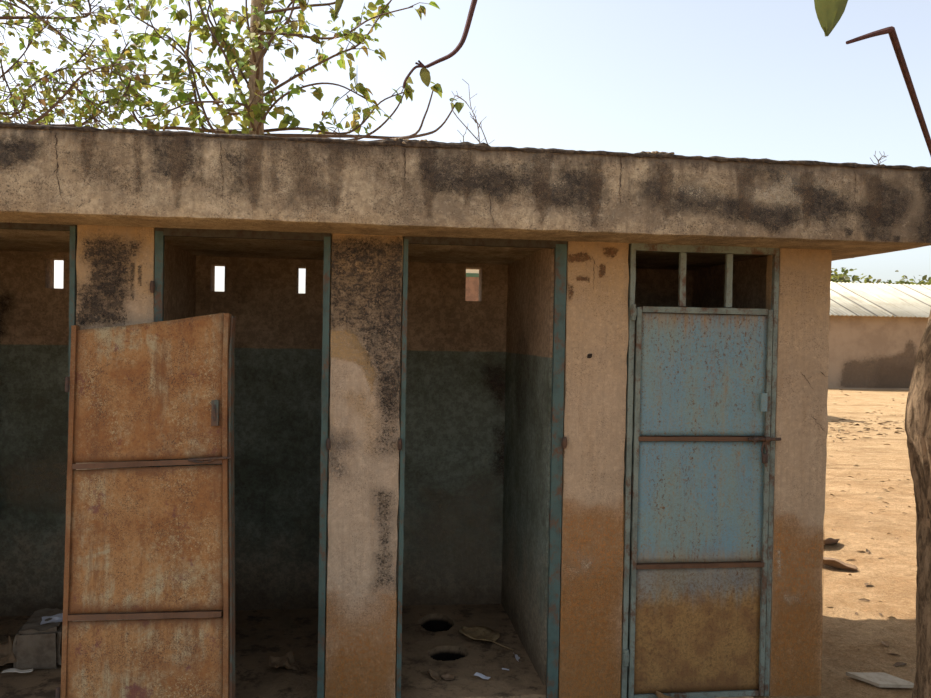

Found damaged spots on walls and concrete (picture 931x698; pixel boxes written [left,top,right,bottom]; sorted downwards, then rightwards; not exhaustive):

damp [0,137,40,170]
damp [152,135,203,200]
damp [419,149,604,223]
damp [638,162,908,242]
damp [914,170,931,243]
mould [75,236,143,328]
damp [331,237,403,457]
damp [371,490,394,589]